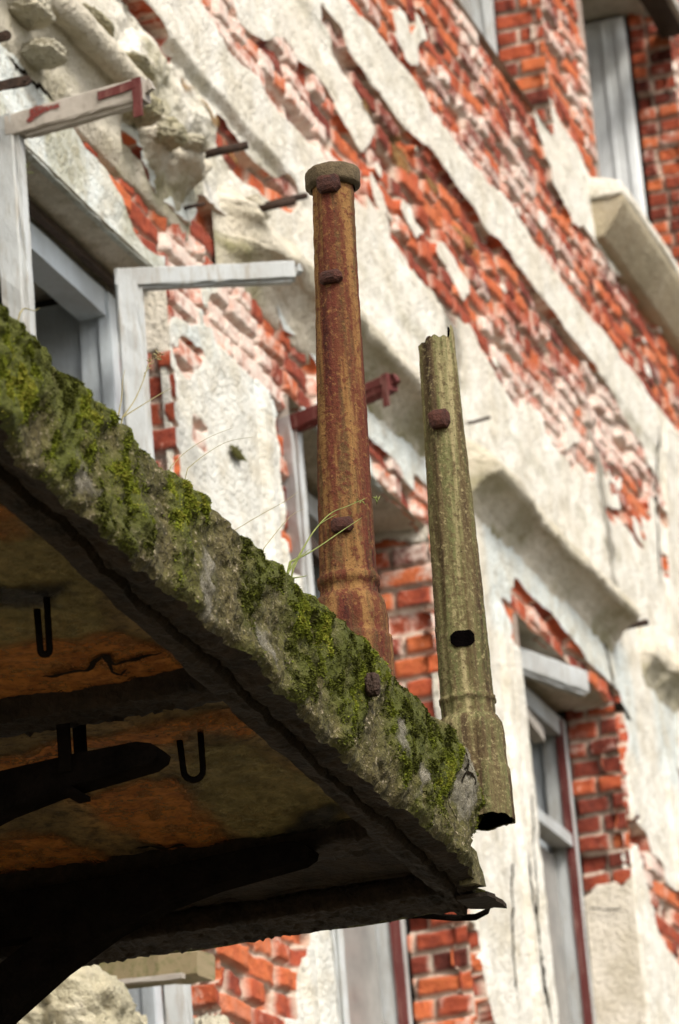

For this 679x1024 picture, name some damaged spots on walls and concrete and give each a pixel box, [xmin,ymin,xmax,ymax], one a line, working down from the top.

spalling [202,0,679,550]
efflorescence [201,550,215,618]
rust [0,634,183,699]
crack [41,652,162,678]
rust [87,710,254,749]
efflorescence [398,720,407,747]
rust [85,779,227,850]
water stain [454,752,477,812]
spalling [501,578,679,963]
rust [0,836,109,874]
spalling [407,846,507,1024]
spalling [191,933,310,1024]